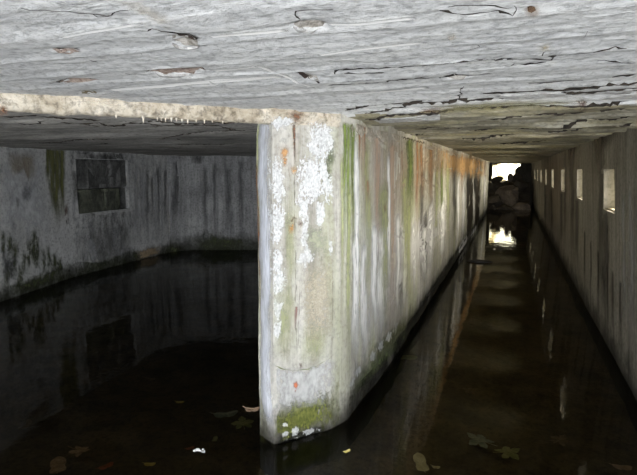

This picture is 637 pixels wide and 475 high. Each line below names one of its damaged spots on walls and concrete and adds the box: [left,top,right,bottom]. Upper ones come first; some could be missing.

spalling [138,29,200,50]
spalling [293,10,326,34]
crack [439,5,517,16]
spalling [146,67,205,78]
crack [329,43,627,86]
crack [34,122,245,145]
water stain [46,149,64,210]
corrosion [390,142,484,245]
water stain [1,233,62,283]
water stain [341,124,486,397]